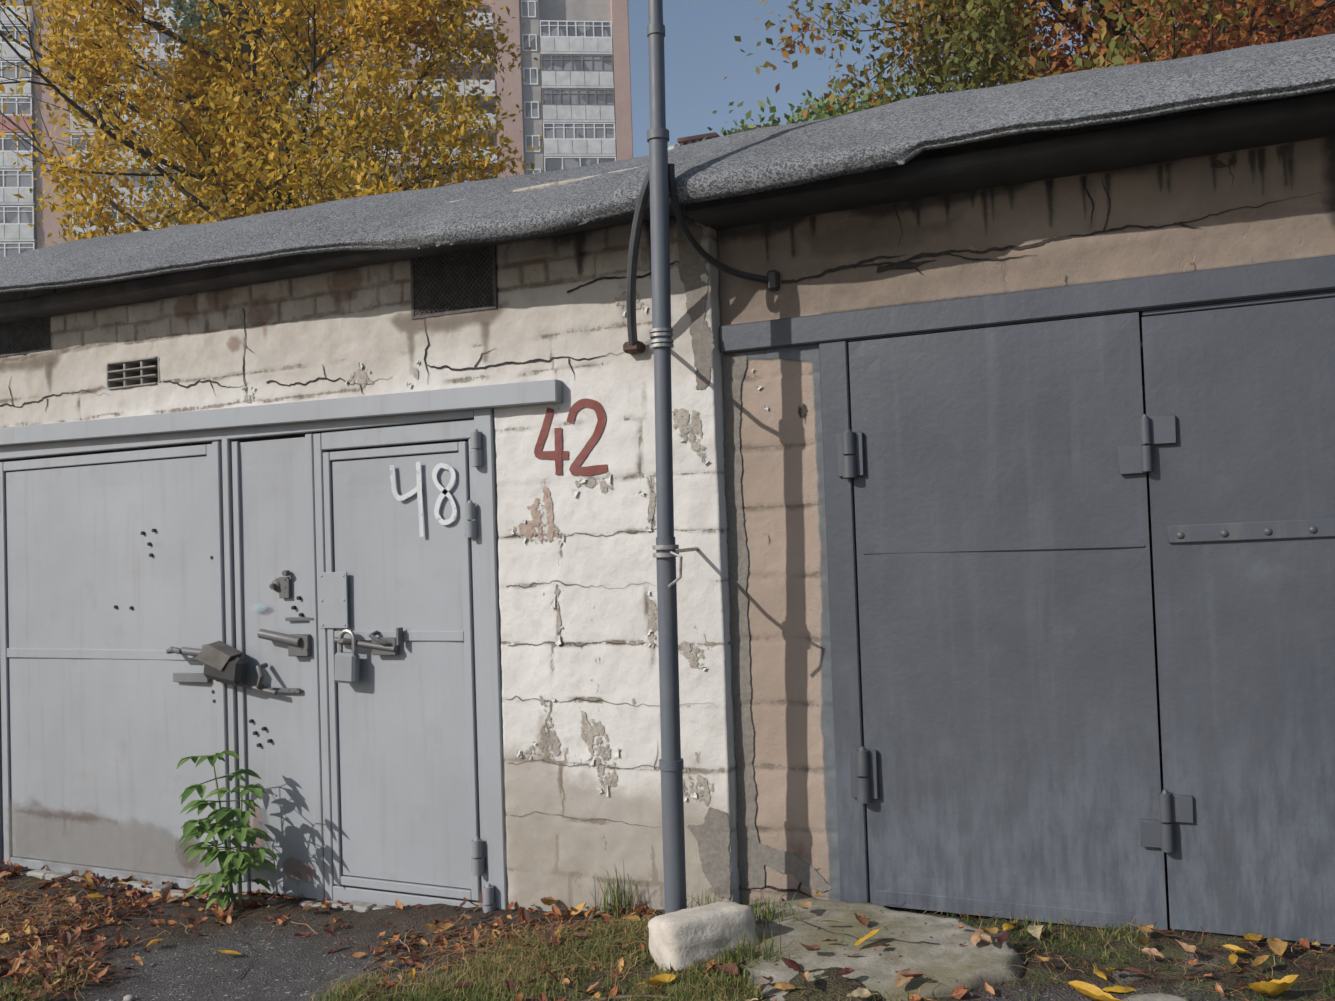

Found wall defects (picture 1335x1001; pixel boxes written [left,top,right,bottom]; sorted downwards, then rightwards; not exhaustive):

leakage [853,180,1052,226]
crack [781,176,1323,284]
crack [164,309,392,396]
crack [424,318,623,383]
peeling [517,696,560,760]
peeling [580,711,619,796]
peeling [683,767,714,806]